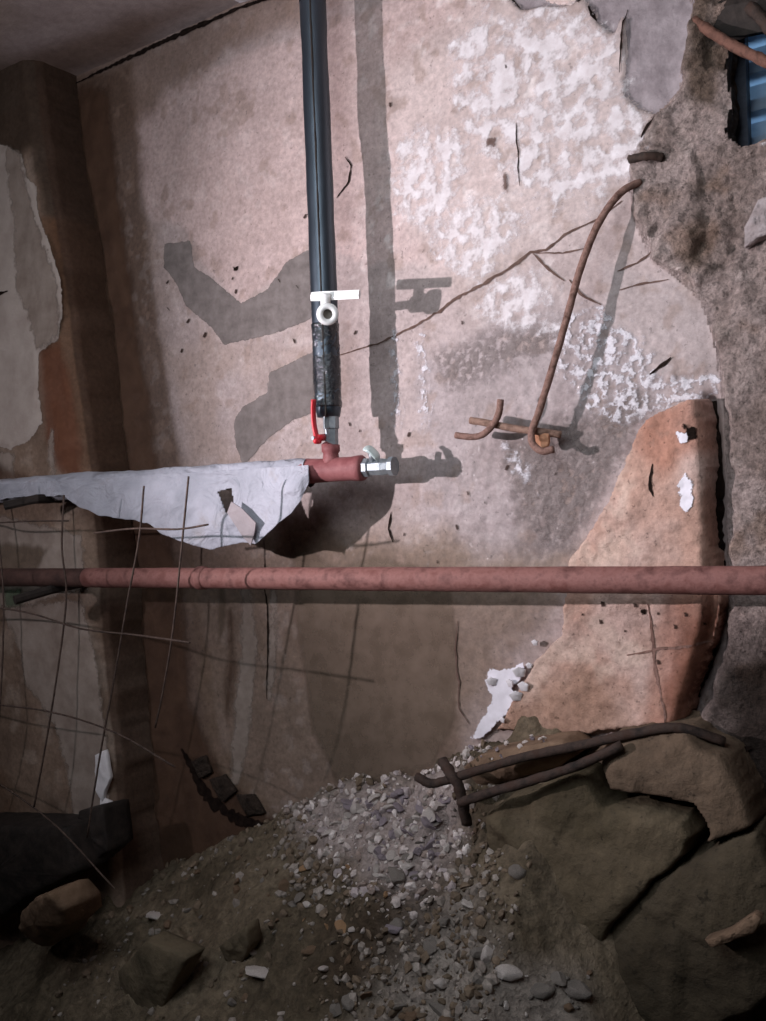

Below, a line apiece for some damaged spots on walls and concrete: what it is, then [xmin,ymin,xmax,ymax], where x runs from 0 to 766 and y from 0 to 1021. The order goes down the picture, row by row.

peeling [0,145,63,450]
crack [340,201,622,355]
spalling [438,0,766,566]
crack [618,251,668,290]
peeling [0,515,84,568]
corrosion [535,433,550,448]
peeling [0,586,113,814]
spalling [414,595,766,808]